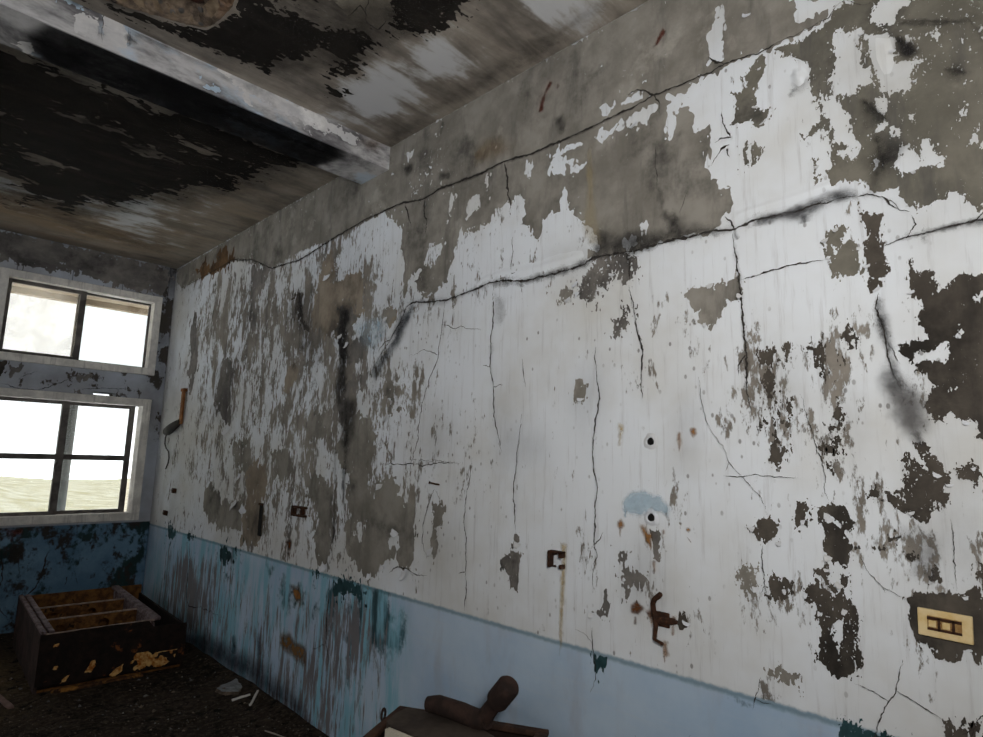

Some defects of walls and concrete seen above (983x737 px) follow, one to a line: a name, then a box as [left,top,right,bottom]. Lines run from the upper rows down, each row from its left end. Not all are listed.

crack [182,0,871,289]
peeling [0,0,983,589]
leakage [335,310,355,445]
peeling [584,545,654,622]
peeling [677,611,691,630]
peeling [735,498,919,681]
peeling [902,561,983,669]
peeling [763,664,804,697]
peeling [942,716,983,737]